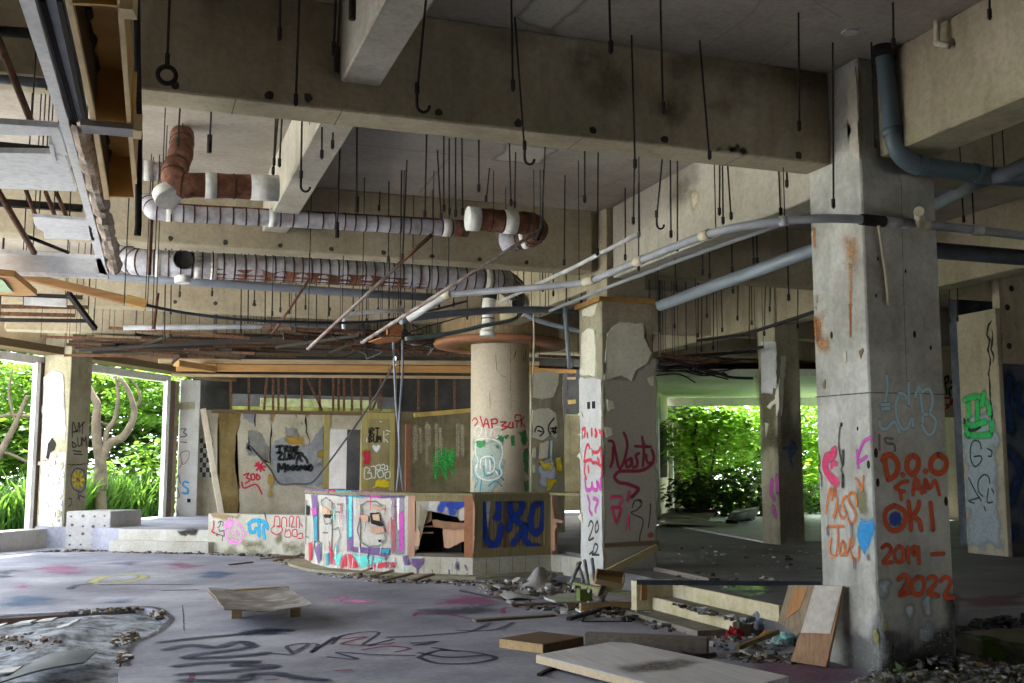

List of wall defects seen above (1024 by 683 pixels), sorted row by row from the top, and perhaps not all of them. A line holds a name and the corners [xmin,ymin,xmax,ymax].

rust [847,241,855,337]
flaking render [531,304,654,575]